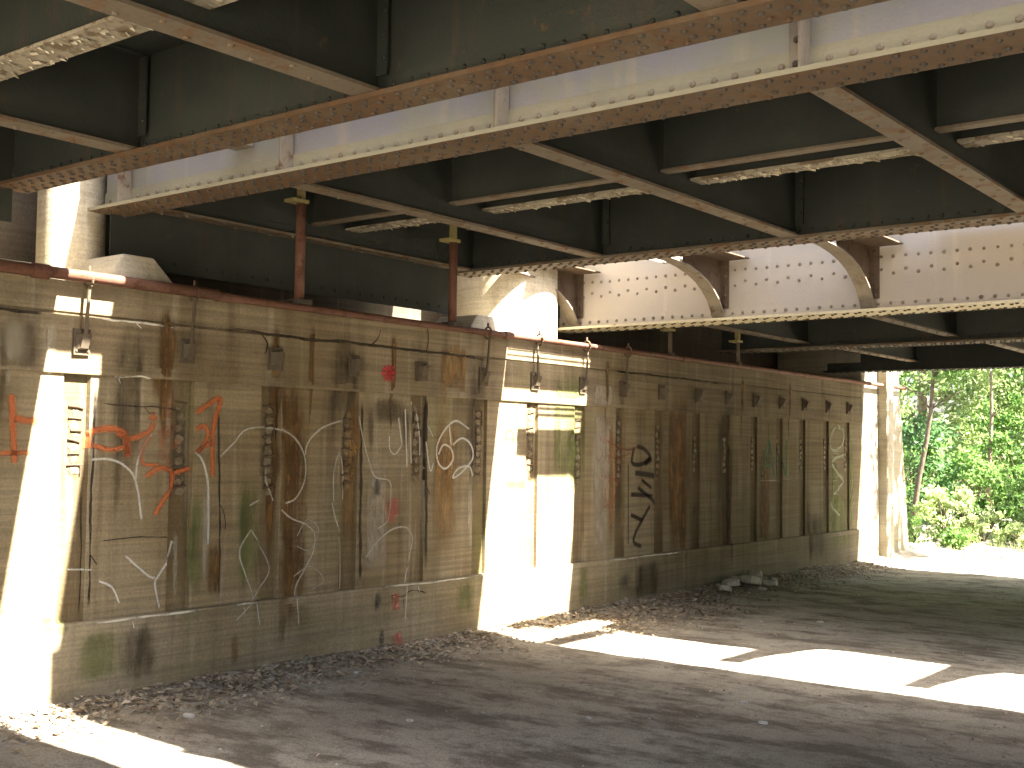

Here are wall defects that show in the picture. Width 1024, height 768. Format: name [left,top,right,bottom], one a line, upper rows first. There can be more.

rust [154,315,176,433]
spalling [172,401,188,495]
spalling [262,405,276,495]
rust [266,332,315,626]